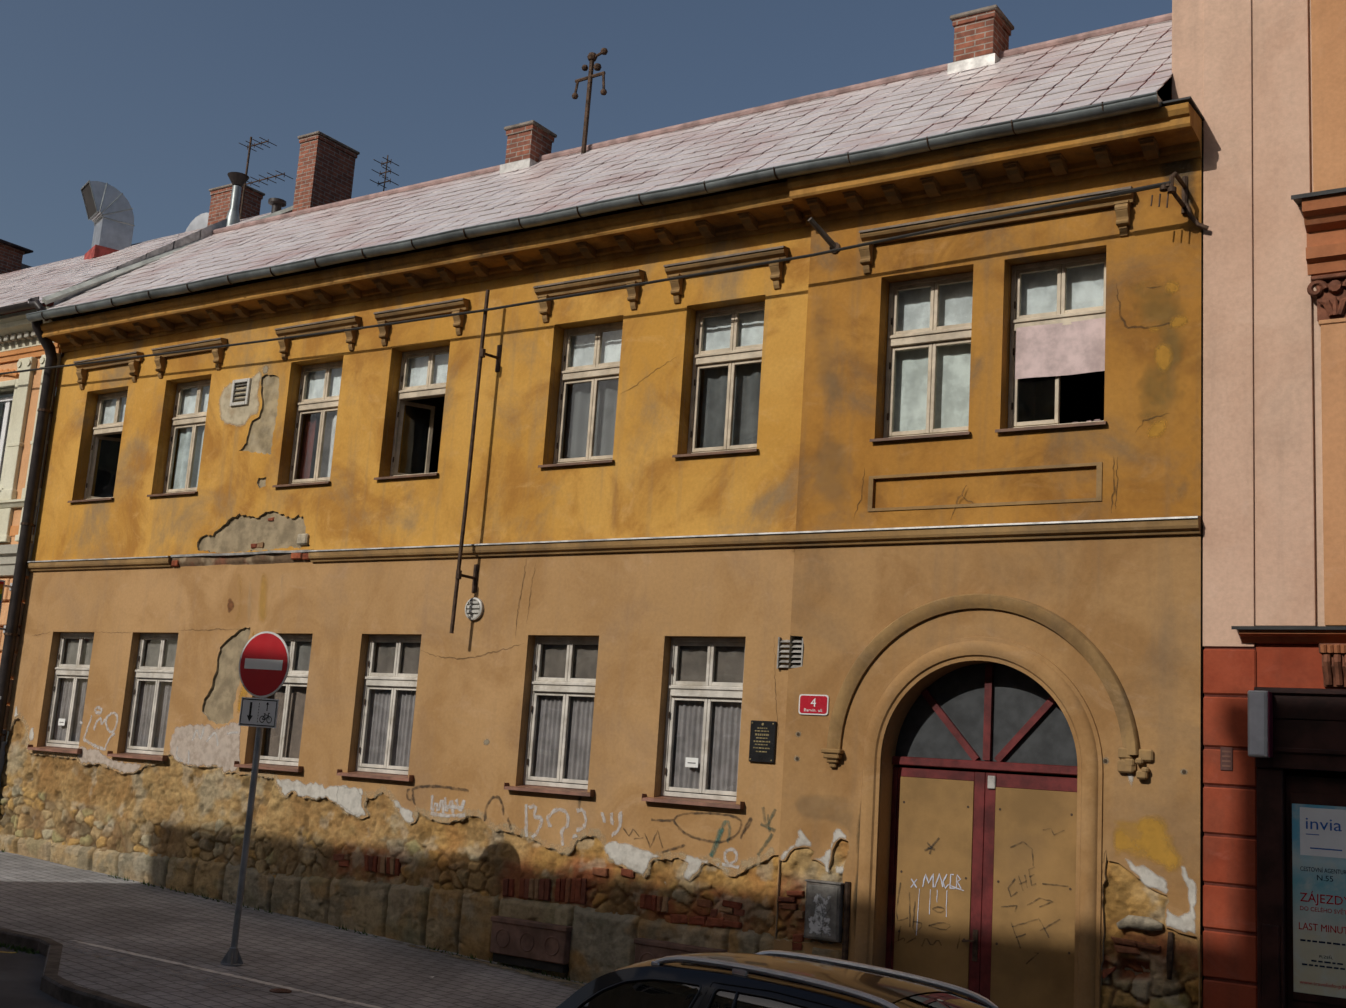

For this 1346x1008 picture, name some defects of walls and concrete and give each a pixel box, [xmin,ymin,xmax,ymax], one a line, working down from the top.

peeling [220,365,279,454]
spalling [199,511,310,560]
spalling [0,628,850,950]
spalling [1101,860,1202,1008]